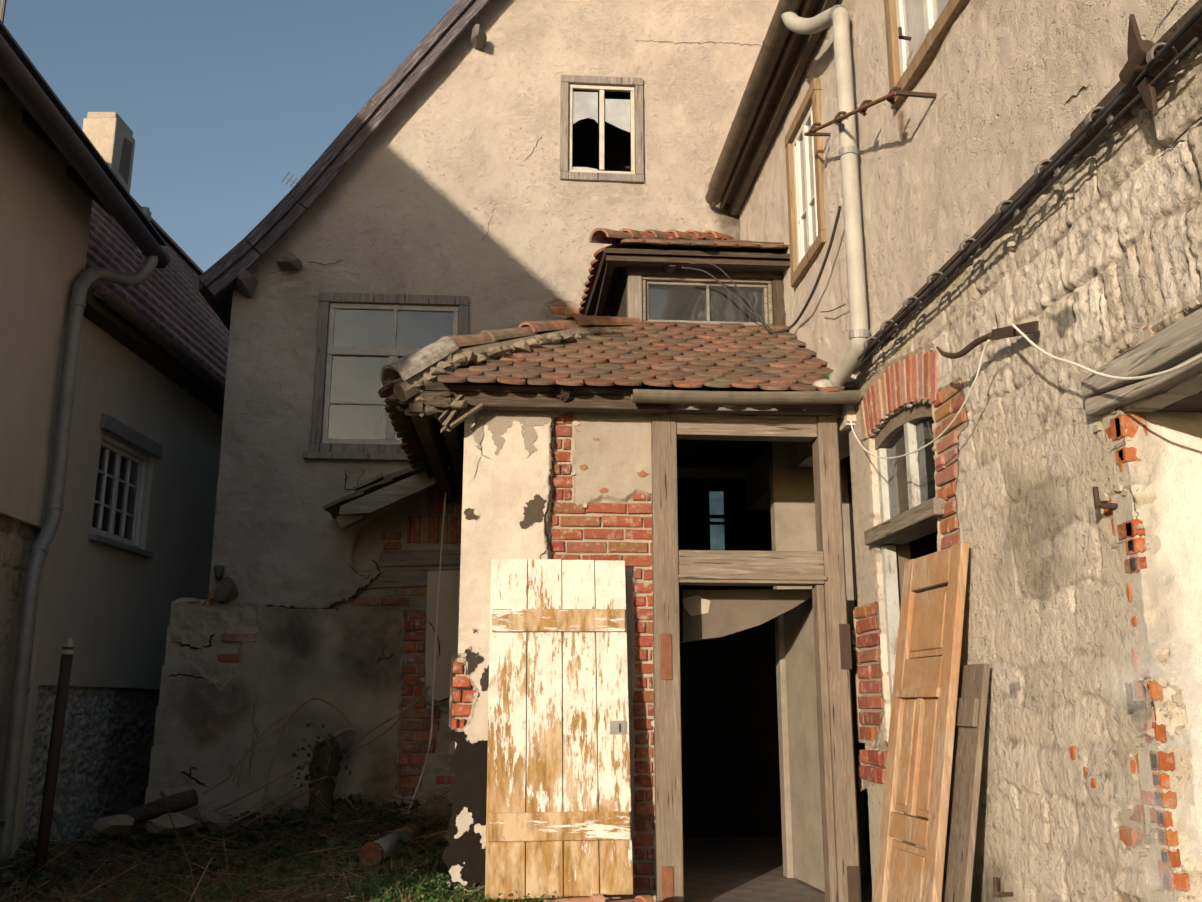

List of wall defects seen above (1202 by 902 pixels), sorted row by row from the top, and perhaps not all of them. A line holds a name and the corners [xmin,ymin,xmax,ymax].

crack [1158,116,1202,158]
flaking render [544,299,595,318]
flaking render [1093,407,1148,602]
crack [264,559,382,610]
flaking render [167,600,262,689]
flaking render [331,477,479,815]
flaking render [473,410,656,902]
flaking render [1112,648,1190,902]
peeling [454,807,486,849]
peeling [447,862,467,887]